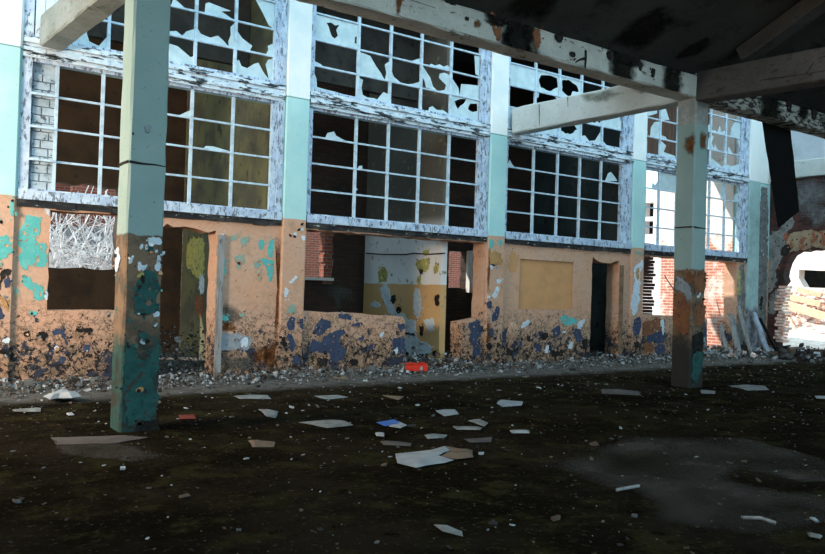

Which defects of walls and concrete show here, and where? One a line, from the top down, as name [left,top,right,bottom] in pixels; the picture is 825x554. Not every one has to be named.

crack [118,159,166,167]
peeling [0,196,52,324]
peeling [24,324,92,363]
peeling [112,237,167,428]
peeling [279,276,373,366]
flaking render [370,250,439,363]
peeling [468,238,589,360]
peeling [630,249,708,386]
flaking render [757,187,825,353]